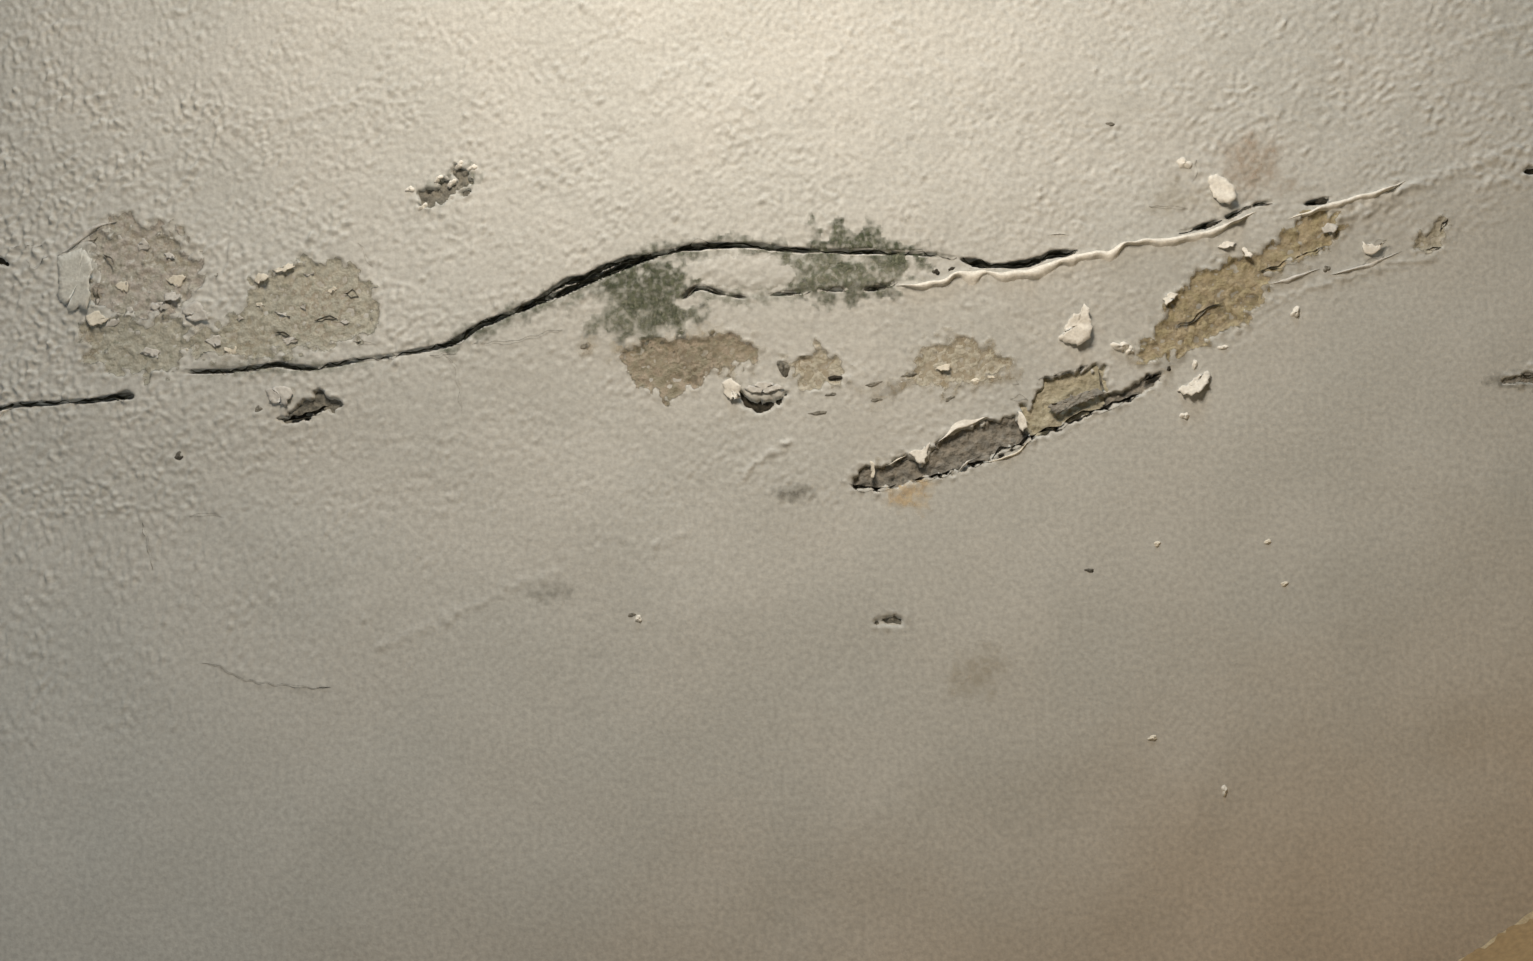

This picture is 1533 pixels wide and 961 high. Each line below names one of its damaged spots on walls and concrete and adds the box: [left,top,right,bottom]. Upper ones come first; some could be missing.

spalling [405,160,478,211]
peeling [1208,174,1237,205]
peeling [0,211,380,386]
mould [588,254,707,348]
crack [188,181,1405,404]
mould [782,215,931,304]
crack [0,394,131,417]
spalling [255,386,343,423]
peeling [617,330,844,416]
spalling [849,210,1452,504]
spalling [1502,373,1533,384]